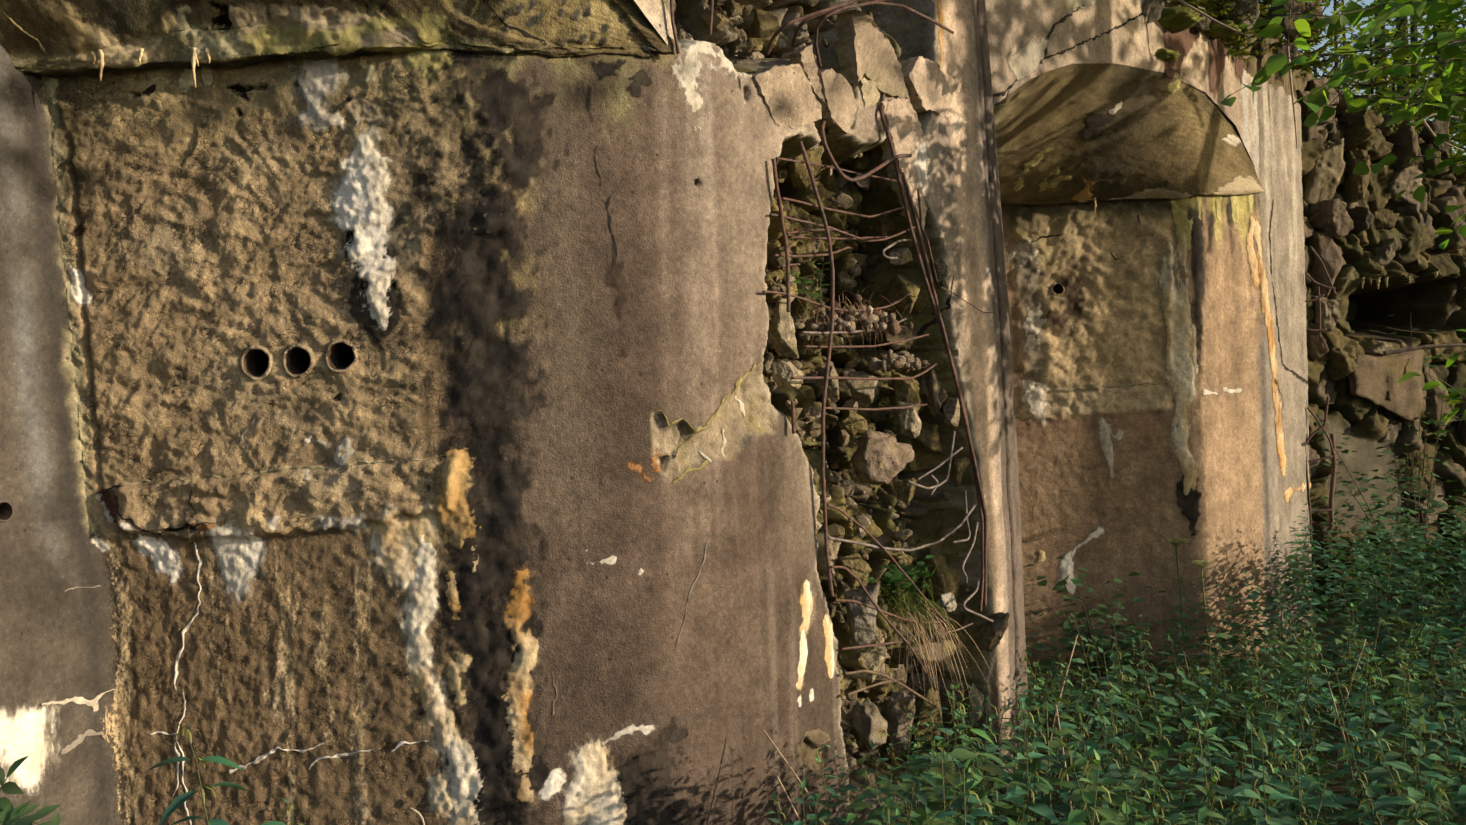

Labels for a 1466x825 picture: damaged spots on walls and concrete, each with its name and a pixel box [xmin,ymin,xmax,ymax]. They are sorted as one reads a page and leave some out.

crack [483,0,547,45]
crack [993,5,1143,106]
leakage [36,0,704,825]
leakage [1008,147,1264,536]
efflorescence [0,707,54,789]
crack [41,689,115,755]
crack [103,417,451,825]
corrosion [501,568,539,802]